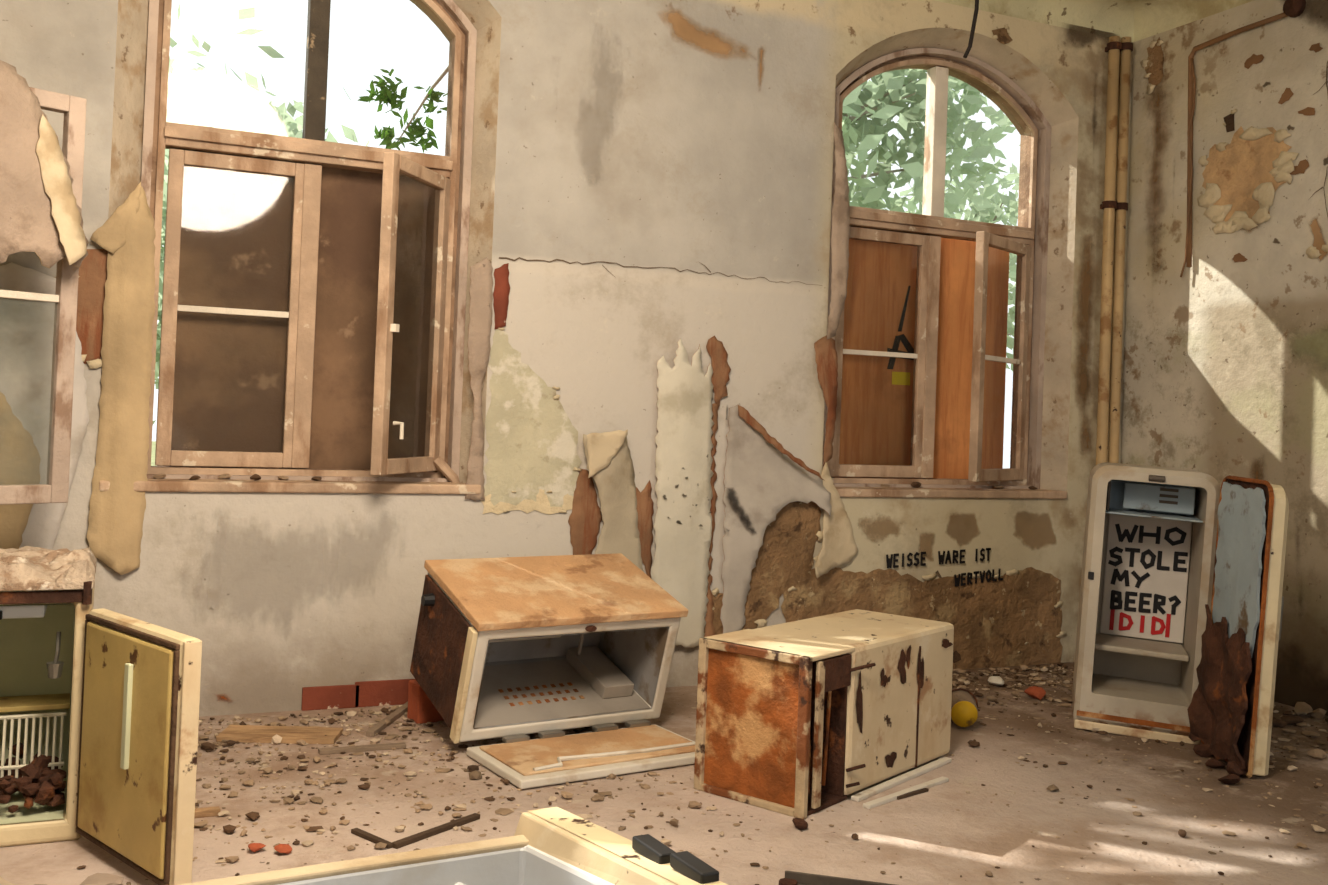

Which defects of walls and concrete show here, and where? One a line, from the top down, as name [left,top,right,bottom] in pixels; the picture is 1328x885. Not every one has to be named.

crack [1313,61,1328,95]
spalling [1197,88,1328,234]
peeling [465,122,1067,669]